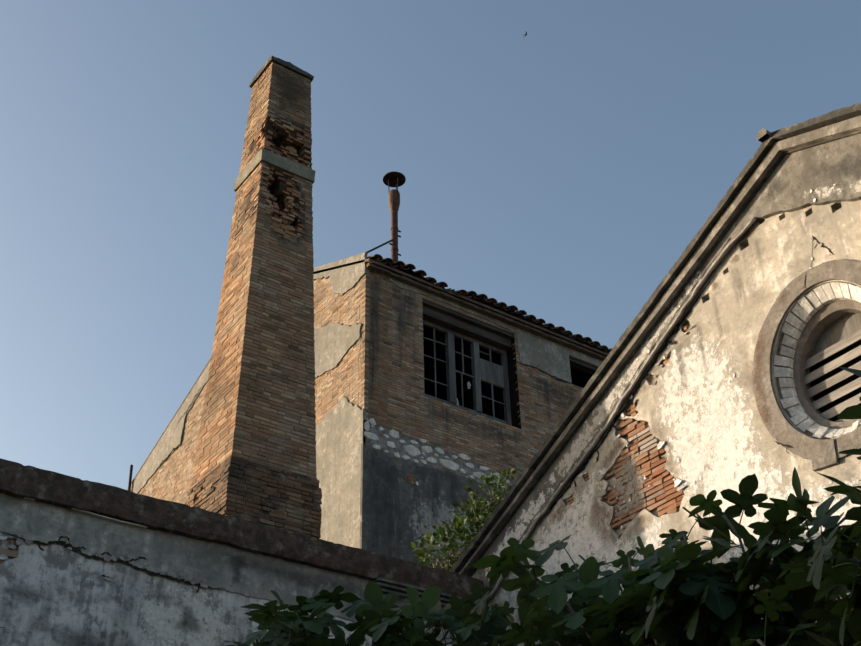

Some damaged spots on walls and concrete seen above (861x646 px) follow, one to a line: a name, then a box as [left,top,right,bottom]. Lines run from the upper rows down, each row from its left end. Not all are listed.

peeling [804,180,861,202]
crack [800,235,835,290]
peeling [493,271,861,583]
flaking render [0,536,24,564]
crack [7,532,226,593]